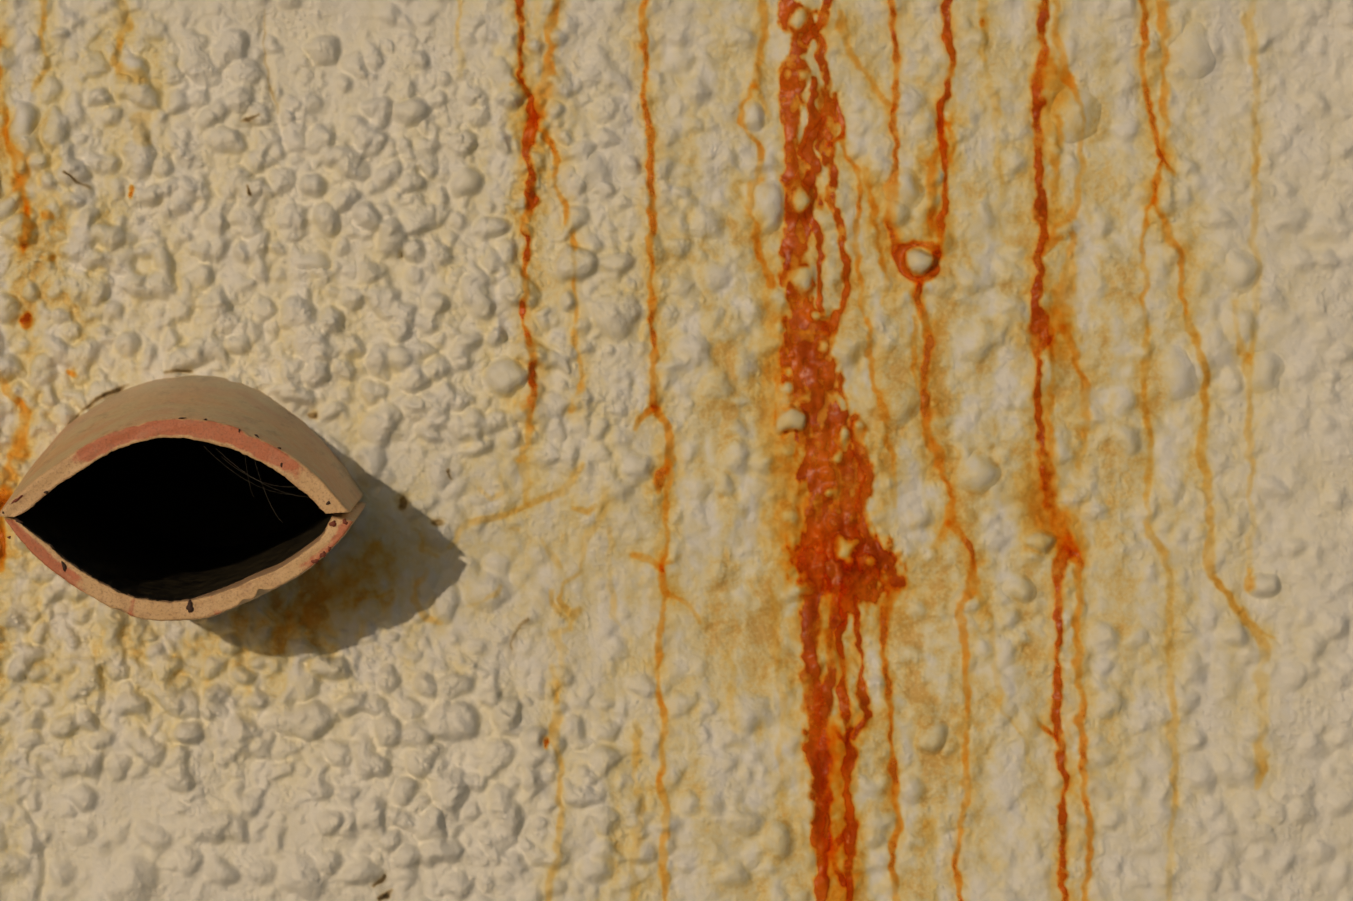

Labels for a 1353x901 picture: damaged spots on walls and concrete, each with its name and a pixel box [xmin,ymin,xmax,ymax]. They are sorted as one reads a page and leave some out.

corrosion [941,0,955,60]
corrosion [1037,0,1049,32]
corrosion [518,32,538,209]
corrosion [937,83,950,227]
corrosion [1032,83,1045,129]
corrosion [893,243,941,303]
corrosion [1031,150,1051,344]
corrosion [1035,362,1044,443]
corrosion [779,0,905,901]
corrosion [1053,609,1062,646]
corrosion [1052,667,1062,732]
corrosion [1058,798,1068,900]